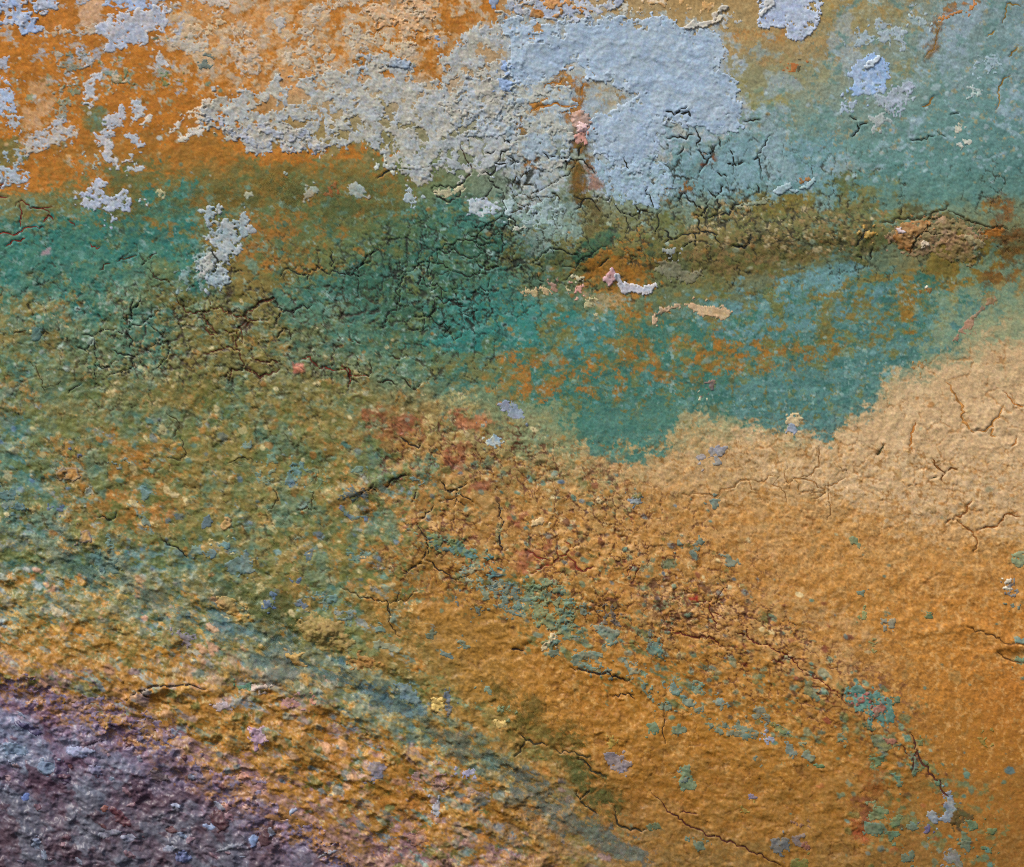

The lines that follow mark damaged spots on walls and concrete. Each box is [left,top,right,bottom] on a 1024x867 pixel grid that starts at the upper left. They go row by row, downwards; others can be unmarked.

peeling [757,0,824,42]
peeling [0,0,745,240]
crack [0,184,421,392]
peeling [174,191,257,296]
peeling [603,247,704,296]
peeling [652,297,733,327]
peeling [737,177,816,212]
crack [856,207,1007,259]
crack [342,475,594,637]
crack [945,501,1019,552]
crack [663,587,846,704]
crack [515,734,645,832]